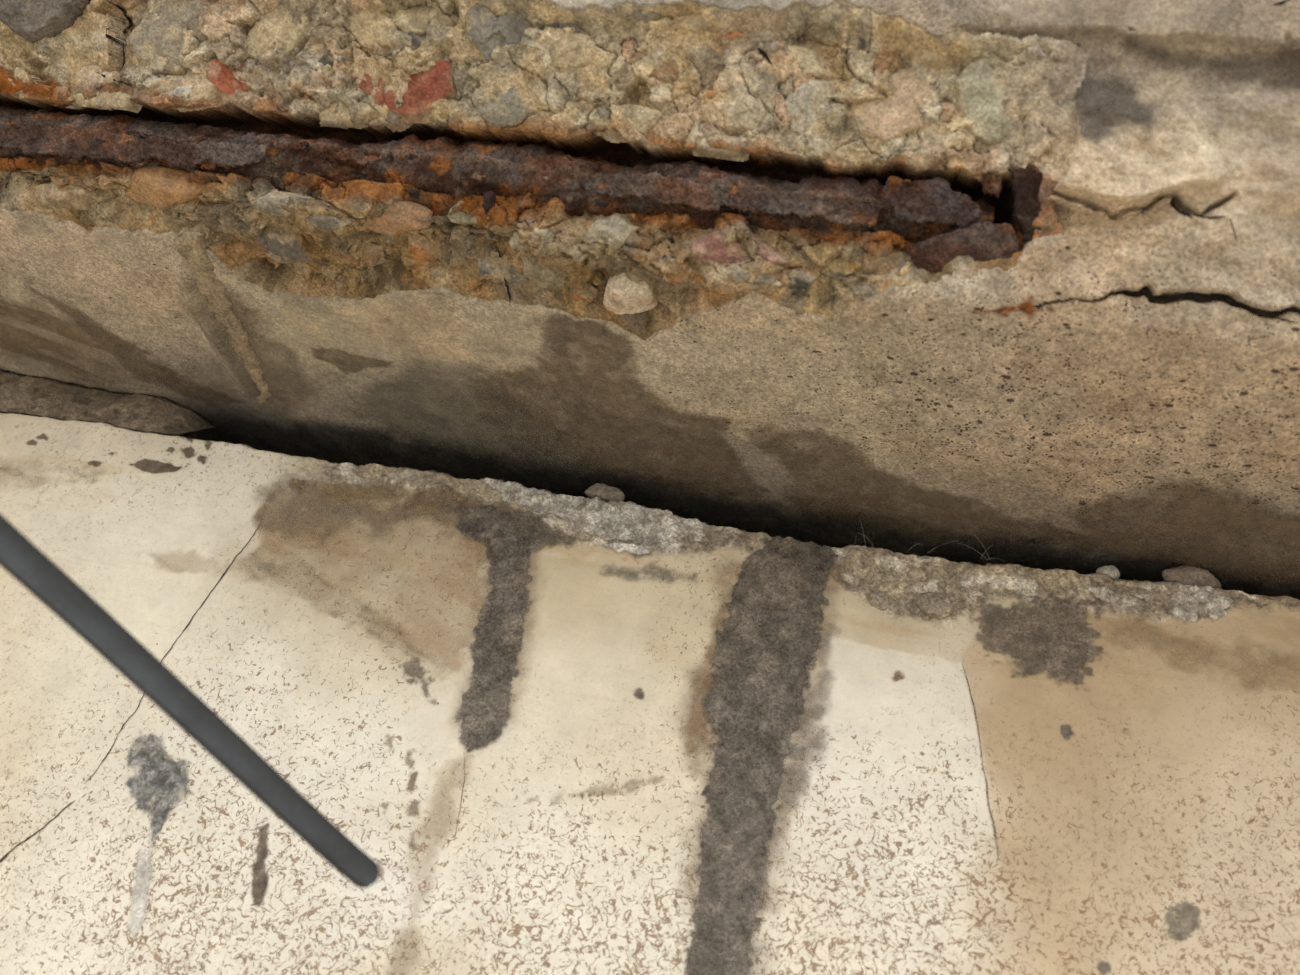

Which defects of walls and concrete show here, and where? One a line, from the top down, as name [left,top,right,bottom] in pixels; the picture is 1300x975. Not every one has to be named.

corrosion [443,124,565,154]
spalling [0,0,1088,341]
corrosion [455,195,518,225]
crack [1170,197,1225,219]
crack [989,286,1300,324]
leakage [0,299,234,403]
leakage [209,315,1300,975]